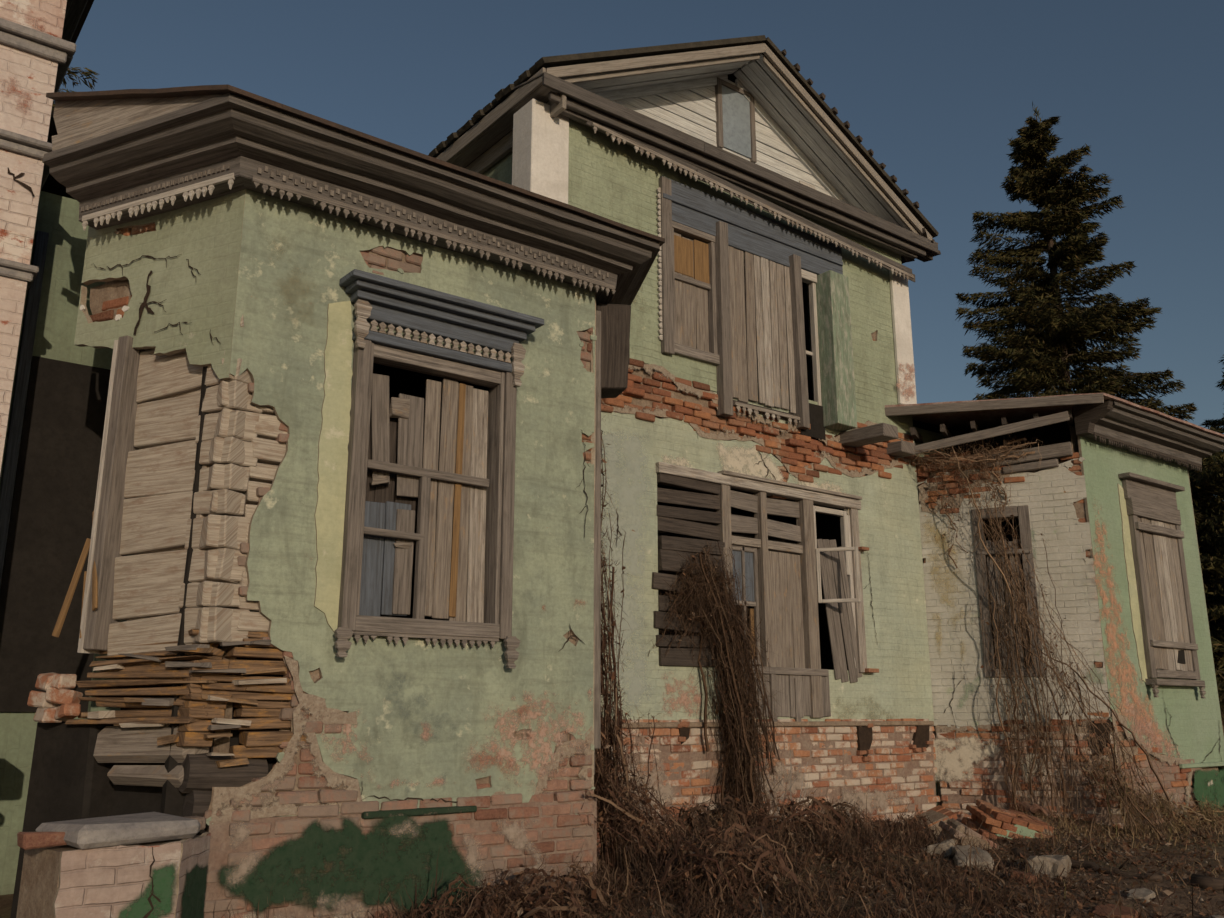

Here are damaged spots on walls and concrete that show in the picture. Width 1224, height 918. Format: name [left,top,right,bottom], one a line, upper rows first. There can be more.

spalling [360,242,423,275]
spalling [80,282,132,322]
crack [93,254,220,344]
peeling [717,443,840,492]
spalling [918,467,1025,515]
damp [1094,523,1169,747]
spalling [186,637,363,830]
spalling [471,694,595,809]
spalling [909,702,1213,820]
spalling [17,832,67,850]
crack [143,847,161,918]